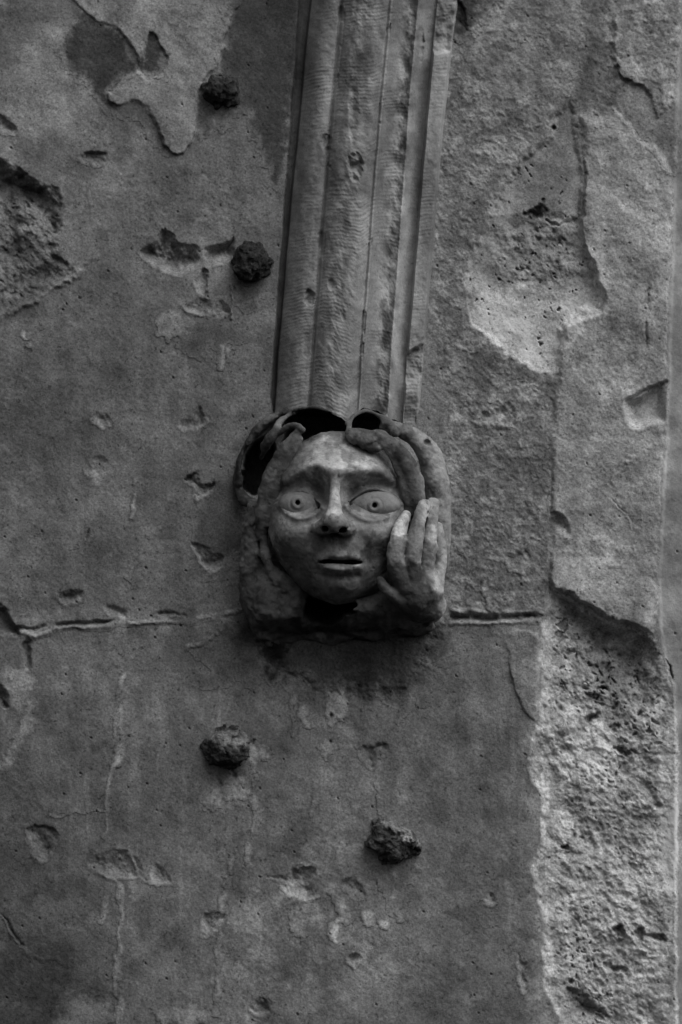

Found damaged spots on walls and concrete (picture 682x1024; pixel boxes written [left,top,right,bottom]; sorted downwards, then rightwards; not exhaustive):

peeling [71,0,225,156]
spalling [0,154,100,323]
peeling [137,228,237,321]
crack [14,607,242,653]
spalling [453,91,682,1024]